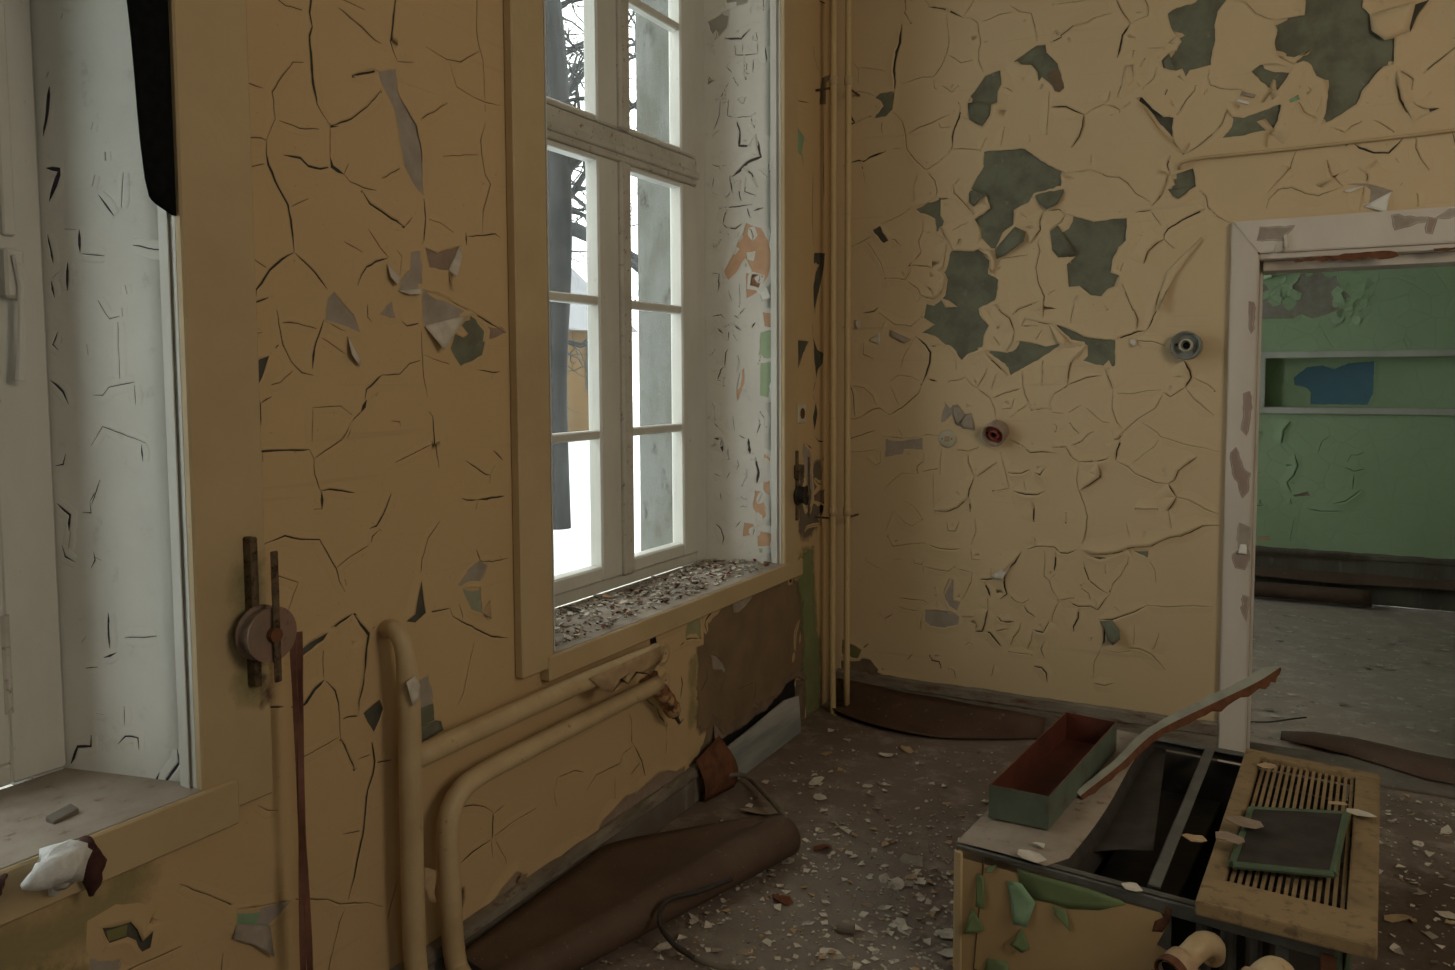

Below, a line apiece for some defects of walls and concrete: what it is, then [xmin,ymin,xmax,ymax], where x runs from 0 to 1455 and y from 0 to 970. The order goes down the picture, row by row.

peeling [868,87,901,126]
peeling [1124,0,1438,208]
peeling [387,236,509,383]
crack [704,0,771,545]
peeling [718,218,771,402]
peeling [890,34,1143,384]
crack [798,0,1455,683]
peeling [1248,225,1399,334]
peeling [1343,179,1455,251]
crack [176,0,509,970]
spalling [689,667,807,777]
crack [792,620,801,662]